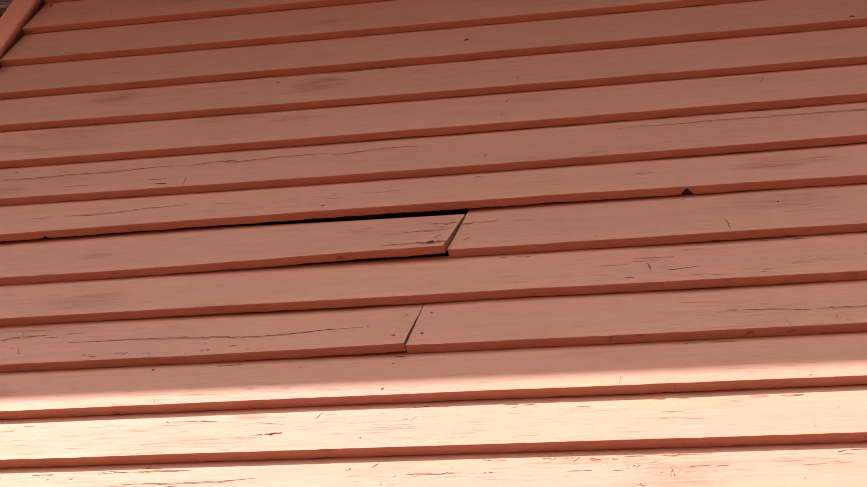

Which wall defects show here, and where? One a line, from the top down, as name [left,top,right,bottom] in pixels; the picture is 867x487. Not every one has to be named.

crack [0,327,360,343]